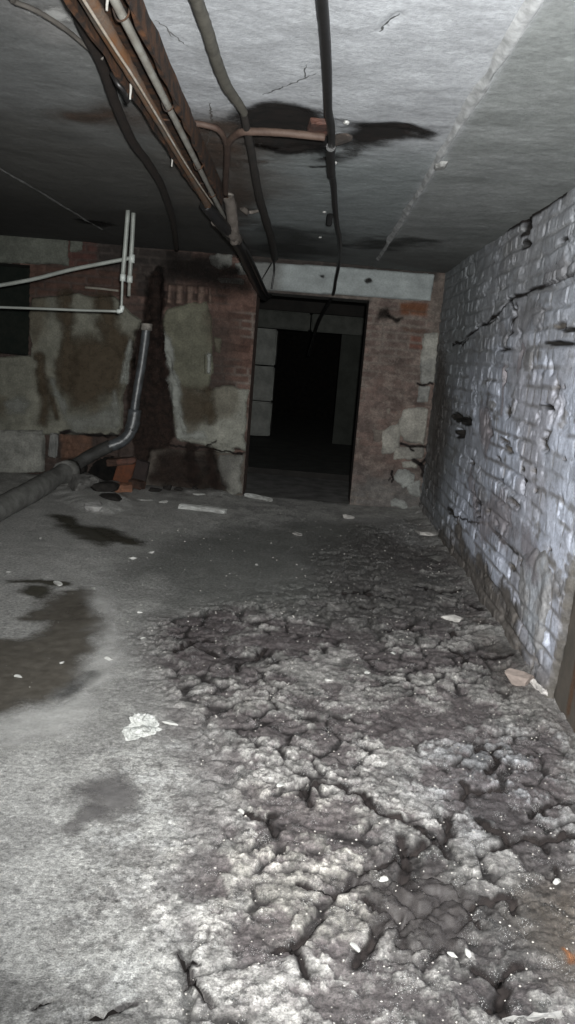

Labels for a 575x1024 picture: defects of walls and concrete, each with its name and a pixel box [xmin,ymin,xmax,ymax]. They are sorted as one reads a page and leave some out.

water stain [274,144,315,154]
water stain [359,123,434,135]
crack [452,273,574,347]
water stain [33,266,227,490]
flaking render [381,332,438,509]
water stain [54,514,144,546]
water stain [0,580,123,747]
crack [173,640,268,673]
crack [242,812,277,838]
crack [270,746,575,980]
crack [177,954,212,1008]
crack [470,962,525,1020]